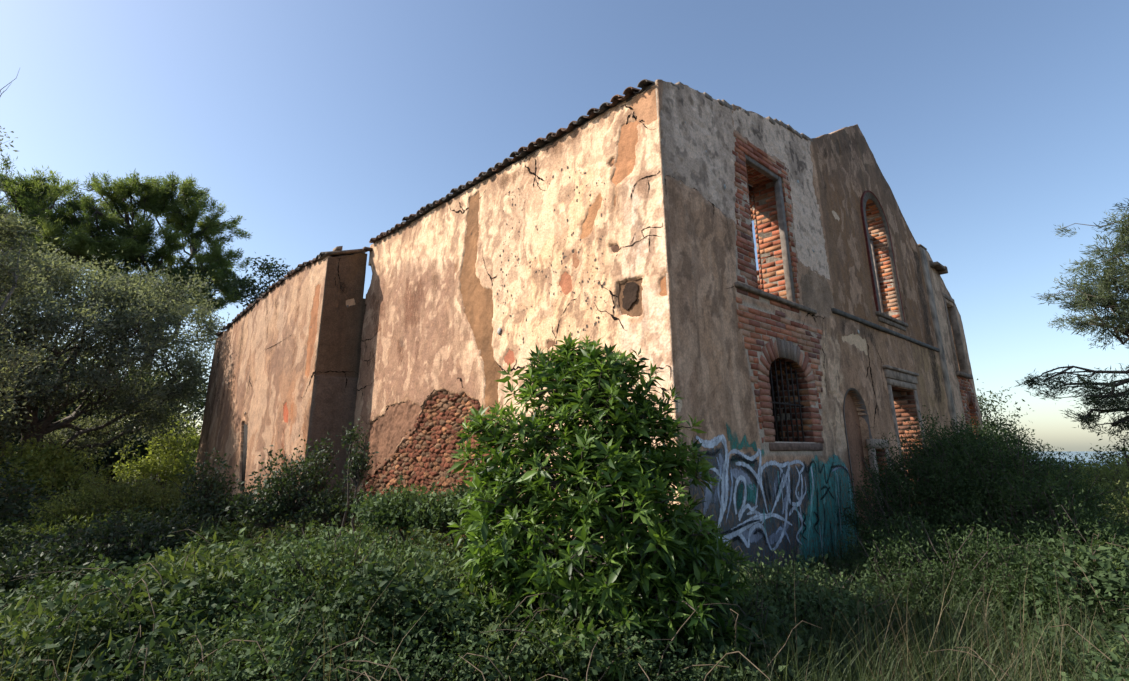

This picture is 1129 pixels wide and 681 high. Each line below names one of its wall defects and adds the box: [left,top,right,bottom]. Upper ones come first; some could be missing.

crack [523,159,546,191]
crack [630,171,715,216]
peeling [559,80,840,318]
crack [552,223,663,342]
flaking render [362,191,515,502]